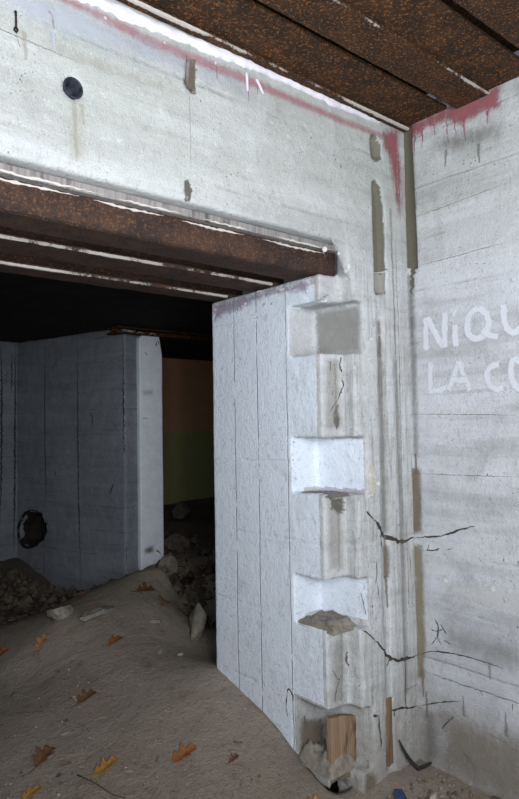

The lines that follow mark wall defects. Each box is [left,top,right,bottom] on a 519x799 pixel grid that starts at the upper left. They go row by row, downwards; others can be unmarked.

spalling [17,510,48,552]
crack [361,511,519,747]